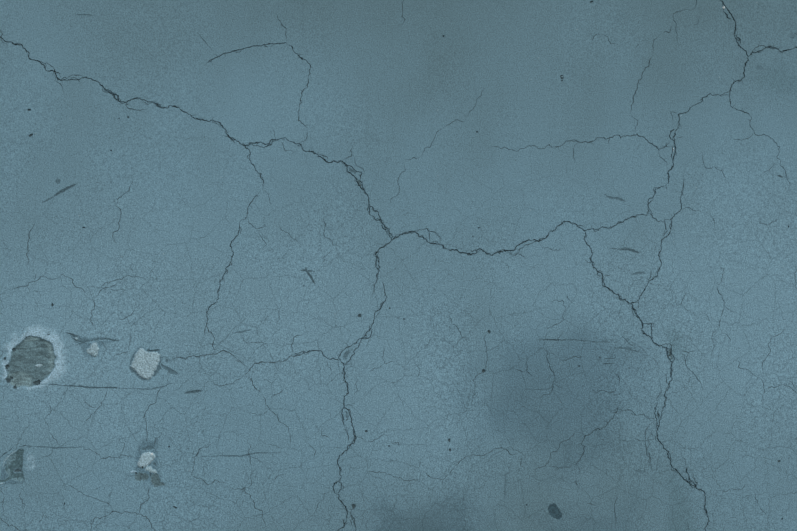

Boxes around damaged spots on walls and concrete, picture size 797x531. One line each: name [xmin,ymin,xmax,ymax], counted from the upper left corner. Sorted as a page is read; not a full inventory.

crack [207,16,311,106]
crack [743,126,790,183]
crack [9,226,142,323]
spalling [0,320,78,396]
crack [171,224,387,531]
crack [738,329,796,398]
spalling [0,445,39,487]
peeling [129,445,165,487]
crack [366,441,515,484]
crack [535,408,649,473]
crack [71,486,155,531]